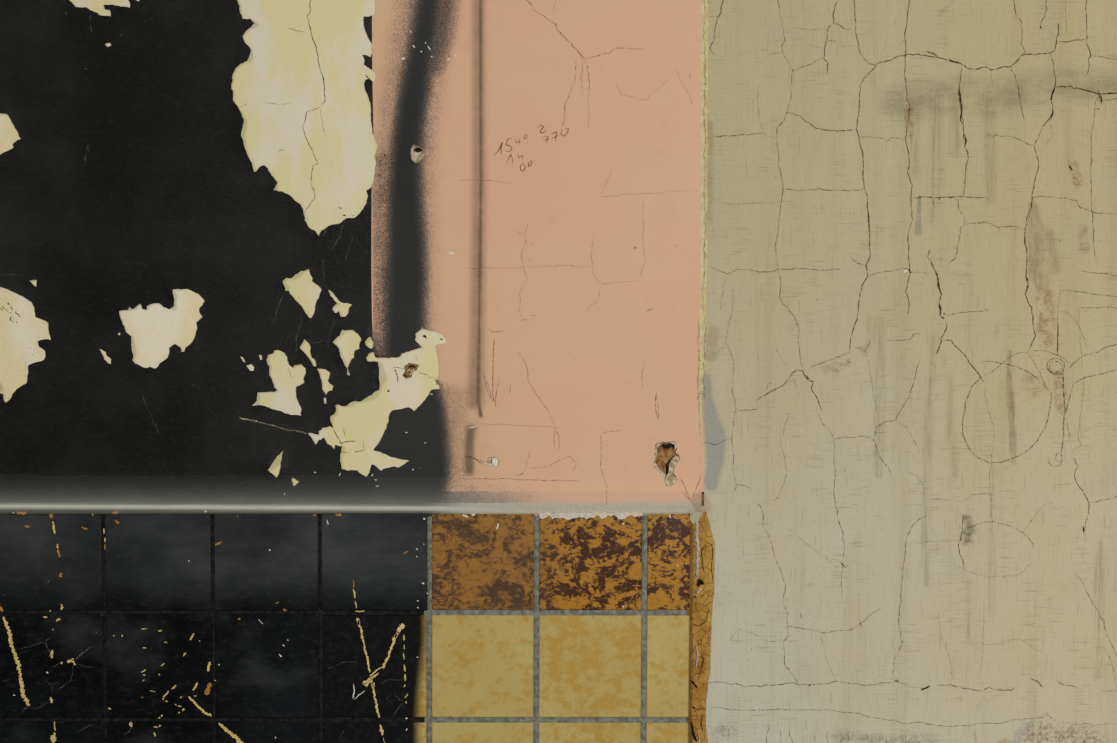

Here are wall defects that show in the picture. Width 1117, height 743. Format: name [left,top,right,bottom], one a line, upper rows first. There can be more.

peeling [0,113,21,155]
peeling [231,0,378,236]
peeling [0,287,51,402]
peeling [118,289,205,369]
peeling [241,270,447,477]
crack [606,0,1117,743]
peeling [268,451,299,495]
hole [654,441,701,498]
crack [49,514,62,577]
crack [43,604,76,665]
crack [49,697,57,743]